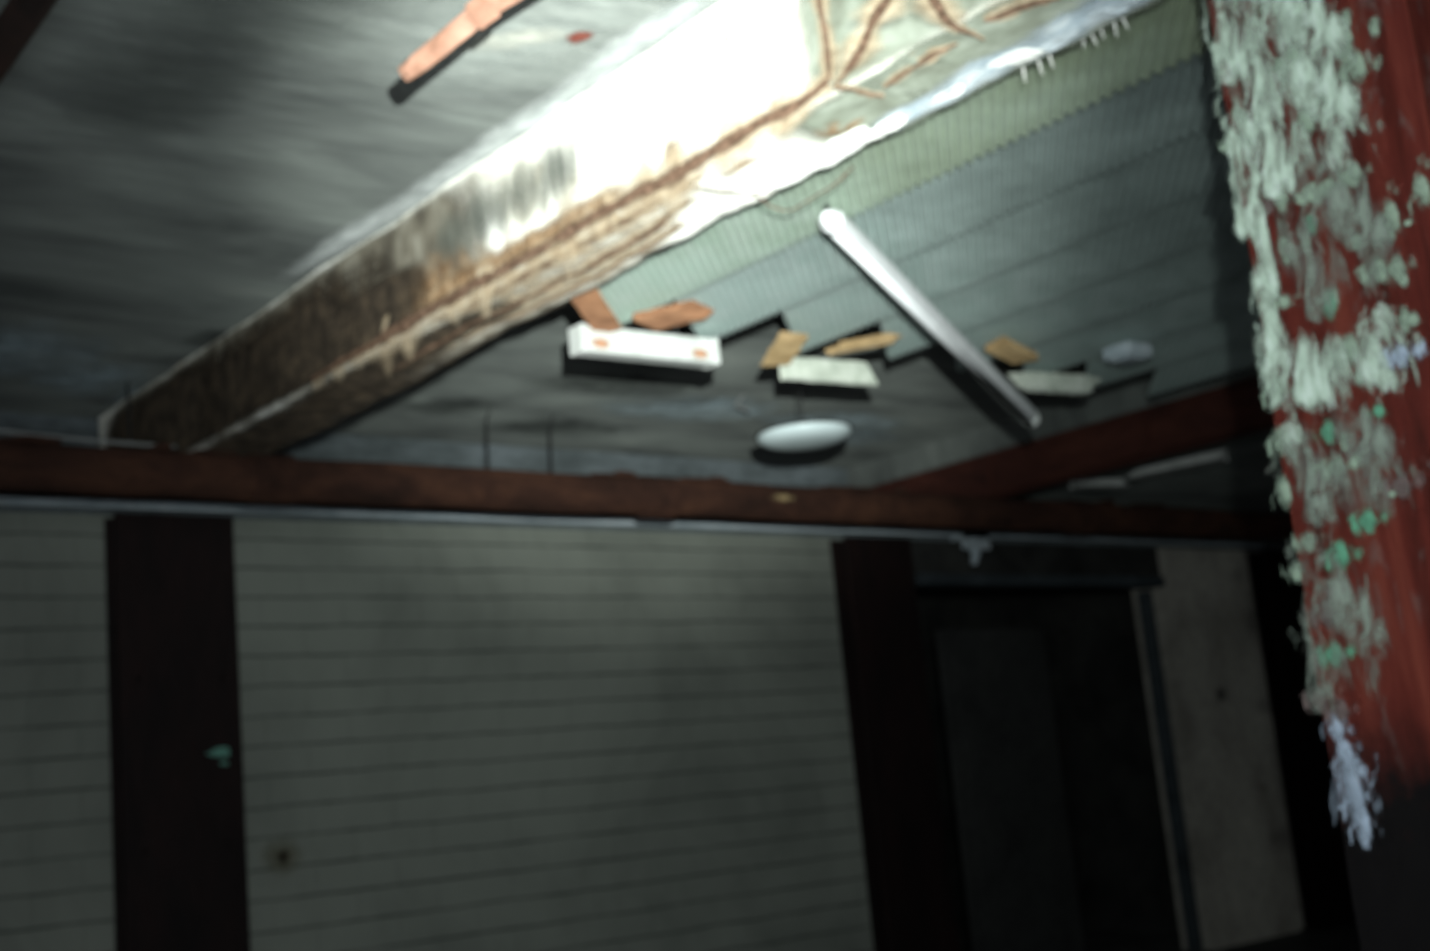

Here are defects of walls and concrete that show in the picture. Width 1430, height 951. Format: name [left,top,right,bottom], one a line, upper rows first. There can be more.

water stain [441,156,563,246]
crack [311,0,1056,386]